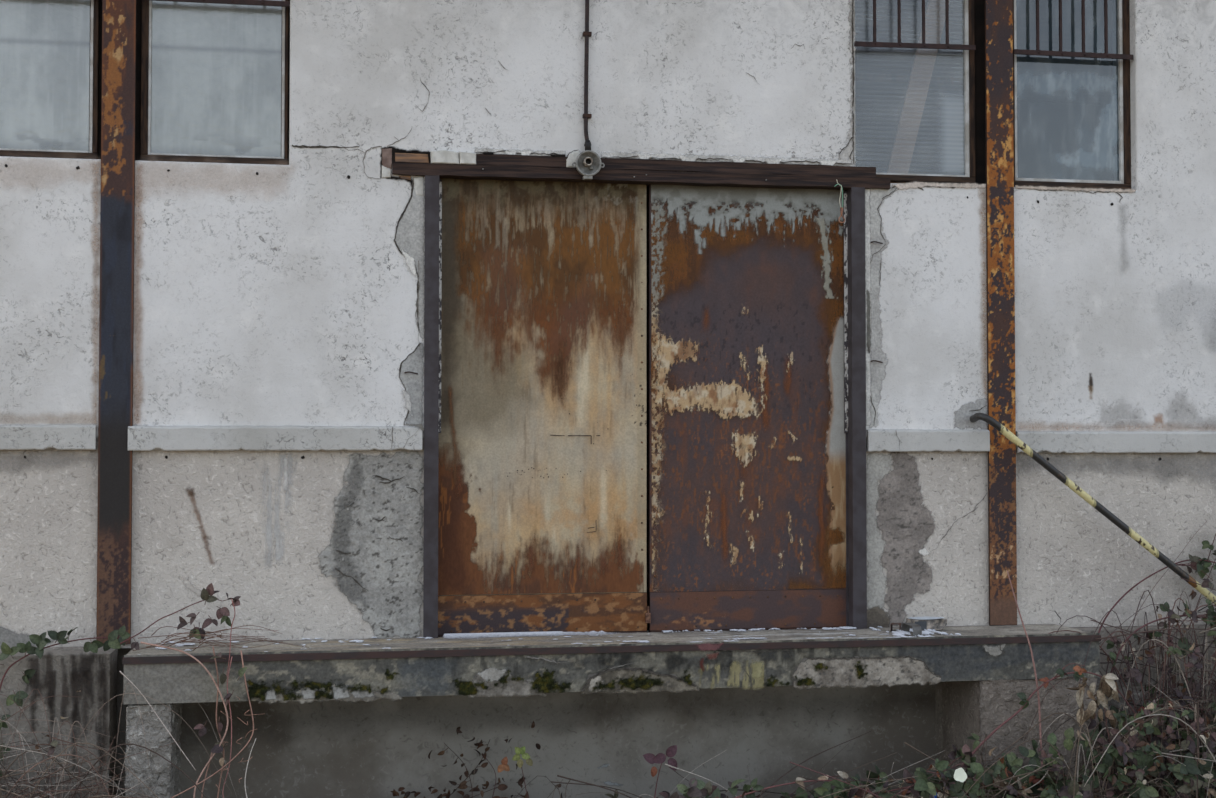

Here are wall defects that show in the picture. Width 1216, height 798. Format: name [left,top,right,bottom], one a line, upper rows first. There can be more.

crack [292,79,430,179]
spalling [380,146,580,428]
rust [457,198,844,397]
peeling [651,185,848,588]
spalling [865,187,898,428]
spalling [0,627,54,648]
water stain [26,653,108,773]
spalling [318,450,424,638]
rust [438,387,644,595]
rust [789,478,846,589]
spalling [866,452,935,628]